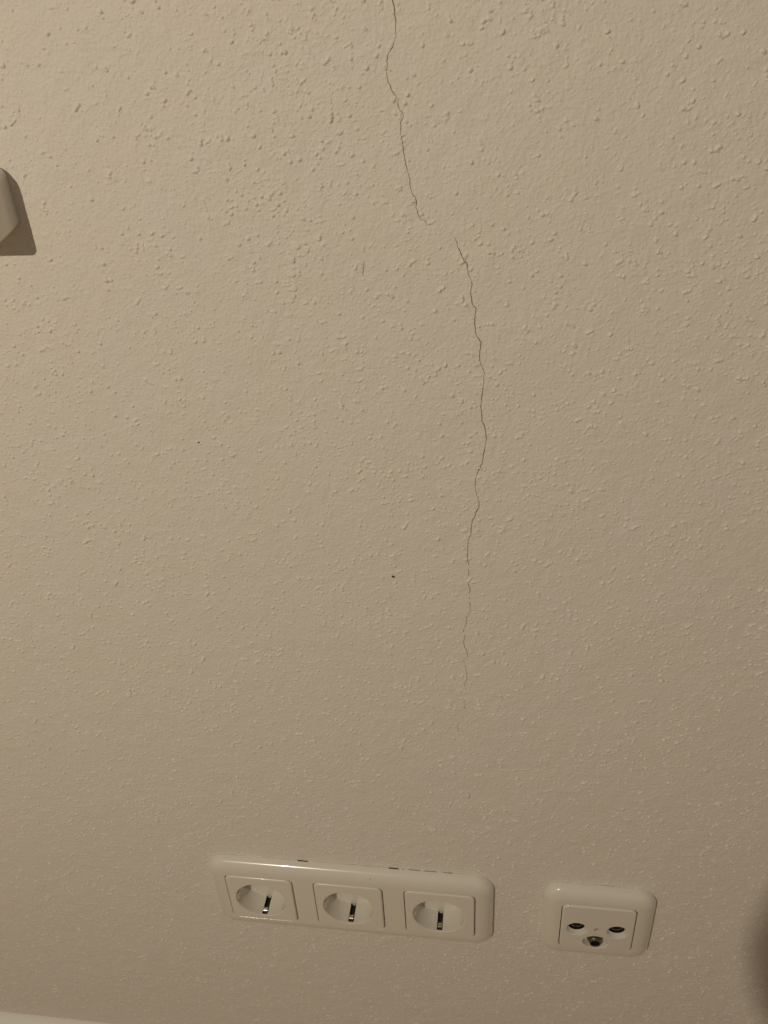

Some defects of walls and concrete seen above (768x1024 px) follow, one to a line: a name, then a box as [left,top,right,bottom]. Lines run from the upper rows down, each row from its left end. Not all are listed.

crack [385,0,427,225]
crack [455,239,487,727]